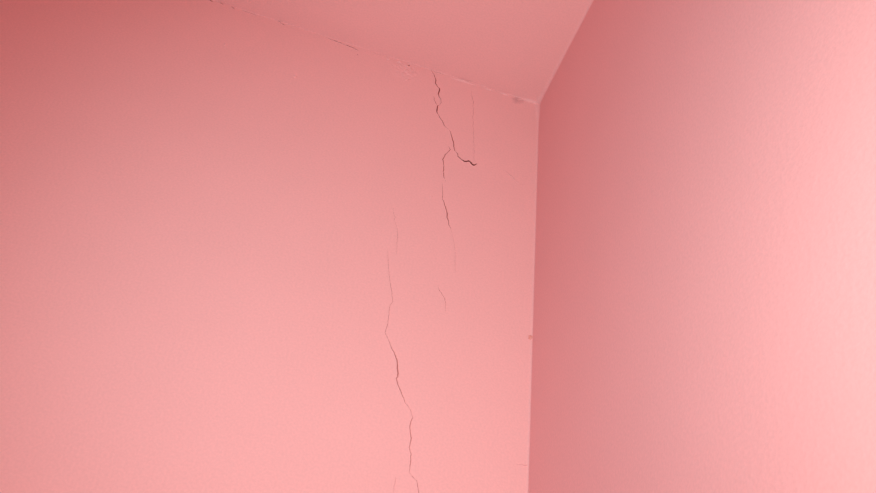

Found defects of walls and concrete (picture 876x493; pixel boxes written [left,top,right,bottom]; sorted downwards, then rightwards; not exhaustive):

crack [430,69,477,271]
crack [385,208,419,493]